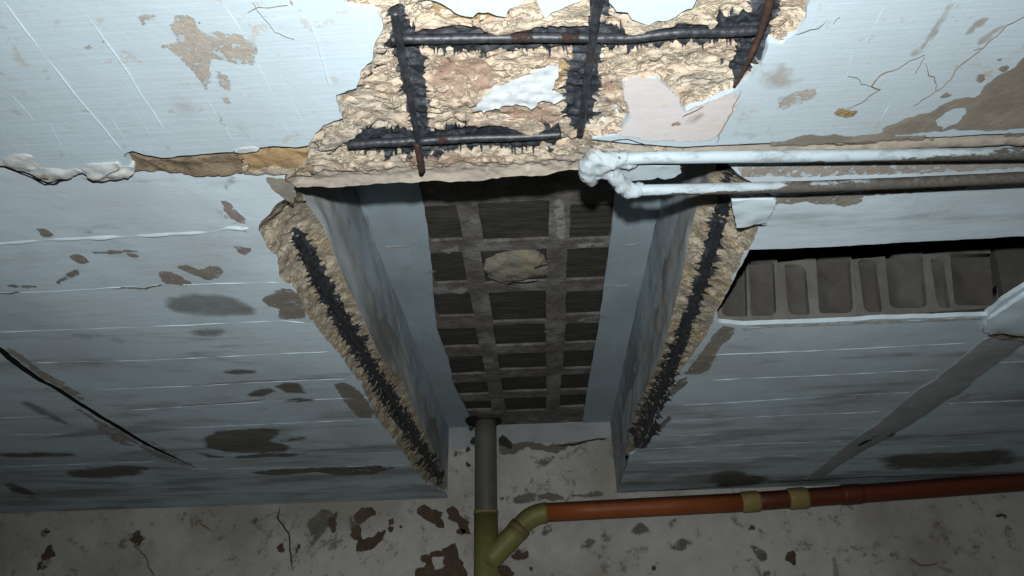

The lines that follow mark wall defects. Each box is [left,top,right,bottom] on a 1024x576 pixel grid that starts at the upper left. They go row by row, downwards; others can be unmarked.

corrosion [510,32,533,43]
crack [847,17,1023,109]
crack [2,166,68,185]
spalling [129,0,807,489]
water stain [170,296,251,314]
spalling [625,163,1024,456]
crack [0,347,195,468]
water stain [205,428,394,476]
water stain [885,450,1009,469]
peeling [349,507,402,552]
peeling [415,504,470,576]